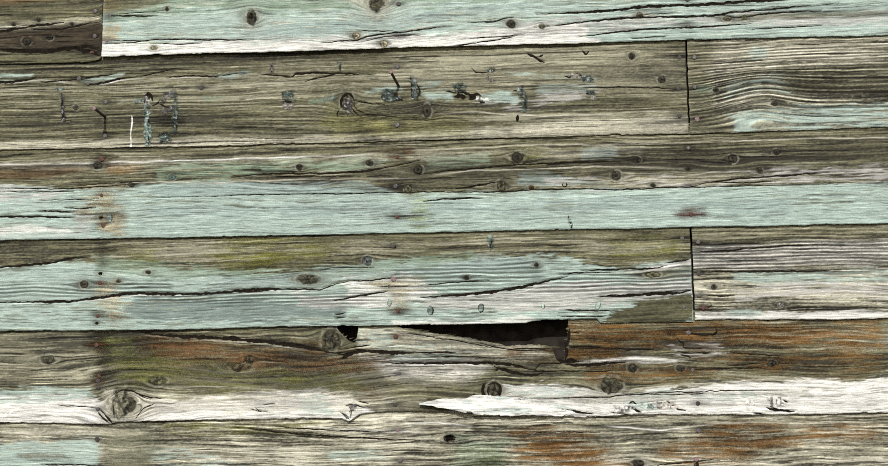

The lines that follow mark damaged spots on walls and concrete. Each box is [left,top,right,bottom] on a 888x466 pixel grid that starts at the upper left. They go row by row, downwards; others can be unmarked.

crack [0,244,826,318]
crack [142,290,794,433]
crack [60,390,162,423]
peeling [613,401,678,413]